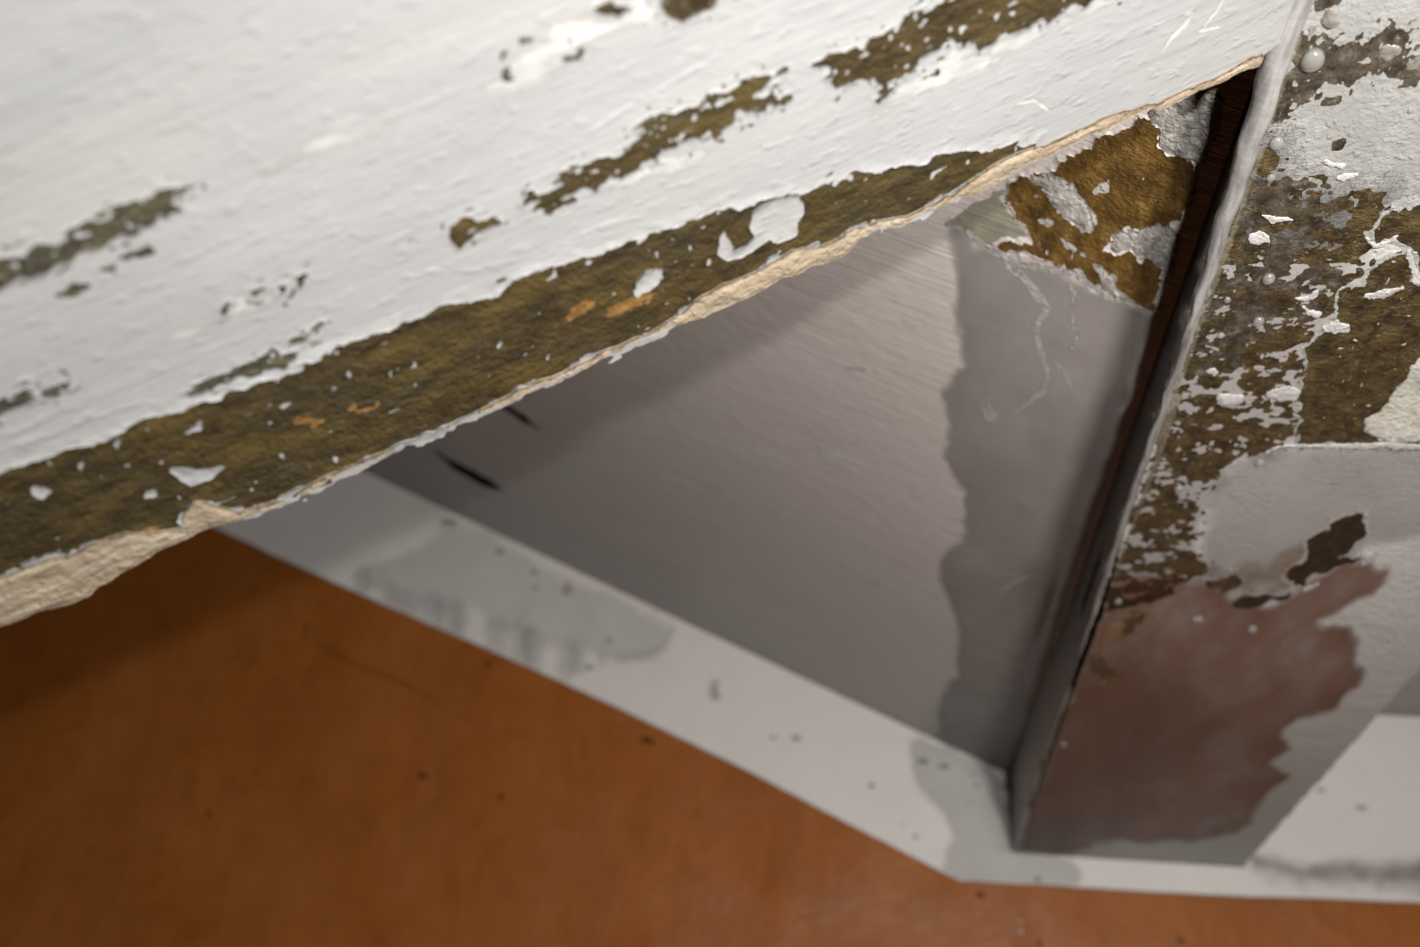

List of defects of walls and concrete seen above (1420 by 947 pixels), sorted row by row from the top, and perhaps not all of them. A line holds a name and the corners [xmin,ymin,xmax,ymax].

peeling [0,53,1264,626]
peeling [441,0,1124,254]
damp [920,233,1130,774]
damp [1022,0,1420,868]
spalling [1265,193,1420,454]